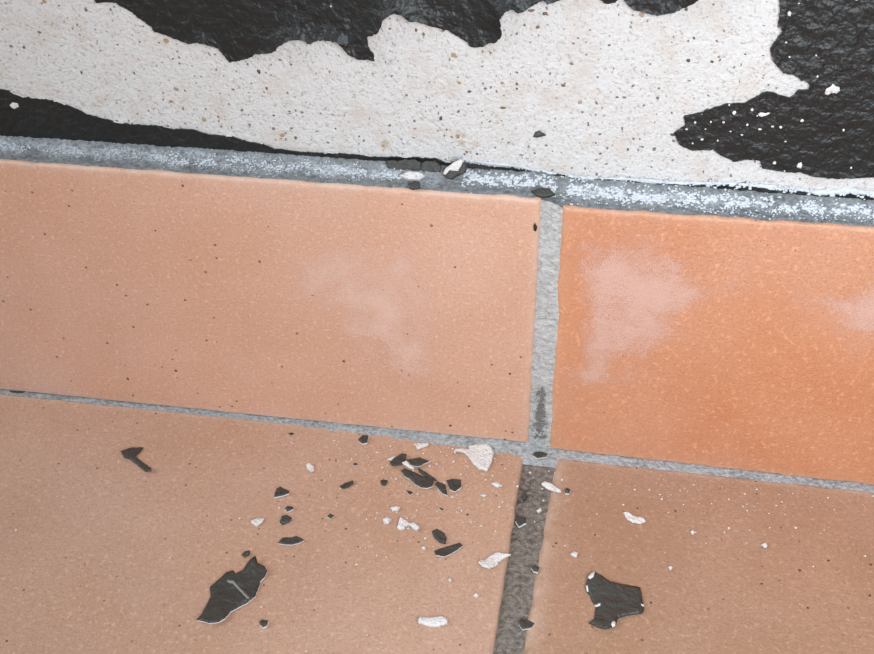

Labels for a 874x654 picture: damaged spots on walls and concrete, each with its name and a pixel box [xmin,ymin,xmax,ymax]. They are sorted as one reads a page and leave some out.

peeling [0,0,874,196]
water stain [456,158,874,222]
water stain [258,206,463,398]
water stain [553,215,748,401]